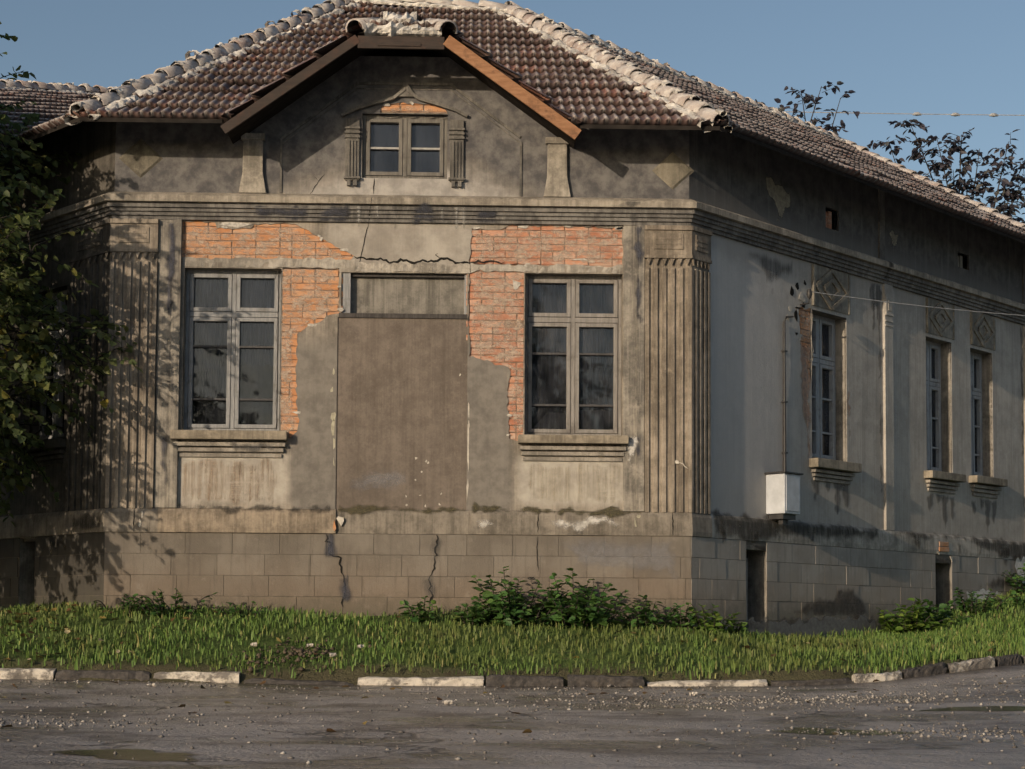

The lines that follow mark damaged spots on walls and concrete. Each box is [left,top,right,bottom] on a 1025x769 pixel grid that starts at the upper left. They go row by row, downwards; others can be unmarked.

flaking render [380,101,448,114]
crack [354,179,504,264]
peeling [766,177,790,216]
flaking render [182,221,353,439]
flaking render [466,225,624,441]
leakage [714,510,878,540]
leakage [928,494,1025,562]
crack [325,534,346,606]
crack [428,535,439,604]